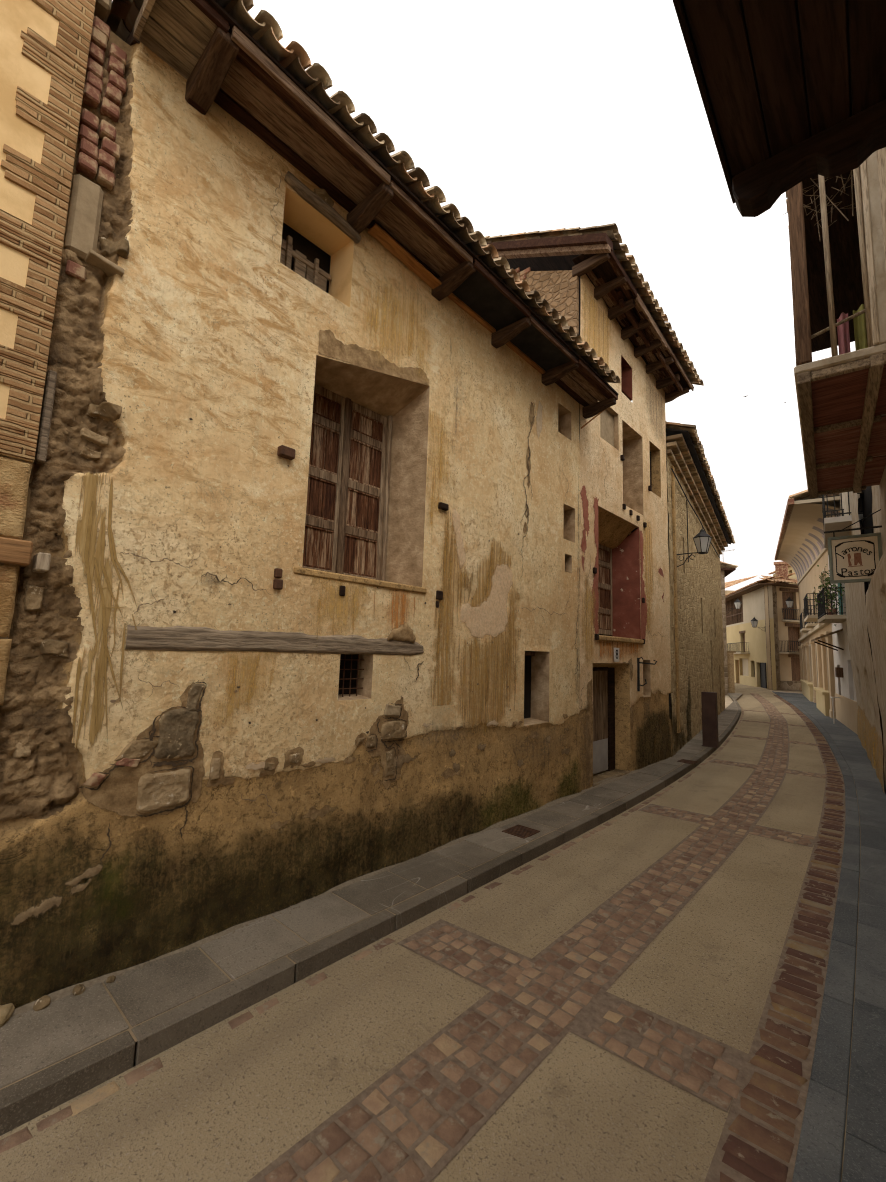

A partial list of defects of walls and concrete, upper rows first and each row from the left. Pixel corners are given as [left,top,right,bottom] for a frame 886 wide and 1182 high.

flaking render [80,402,122,460]
crack [520,402,535,578]
flaking render [23,585,45,612]
crack [522,556,591,743]
flaking render [13,742,31,758]
spalling [77,682,235,817]
spalling [343,697,416,789]